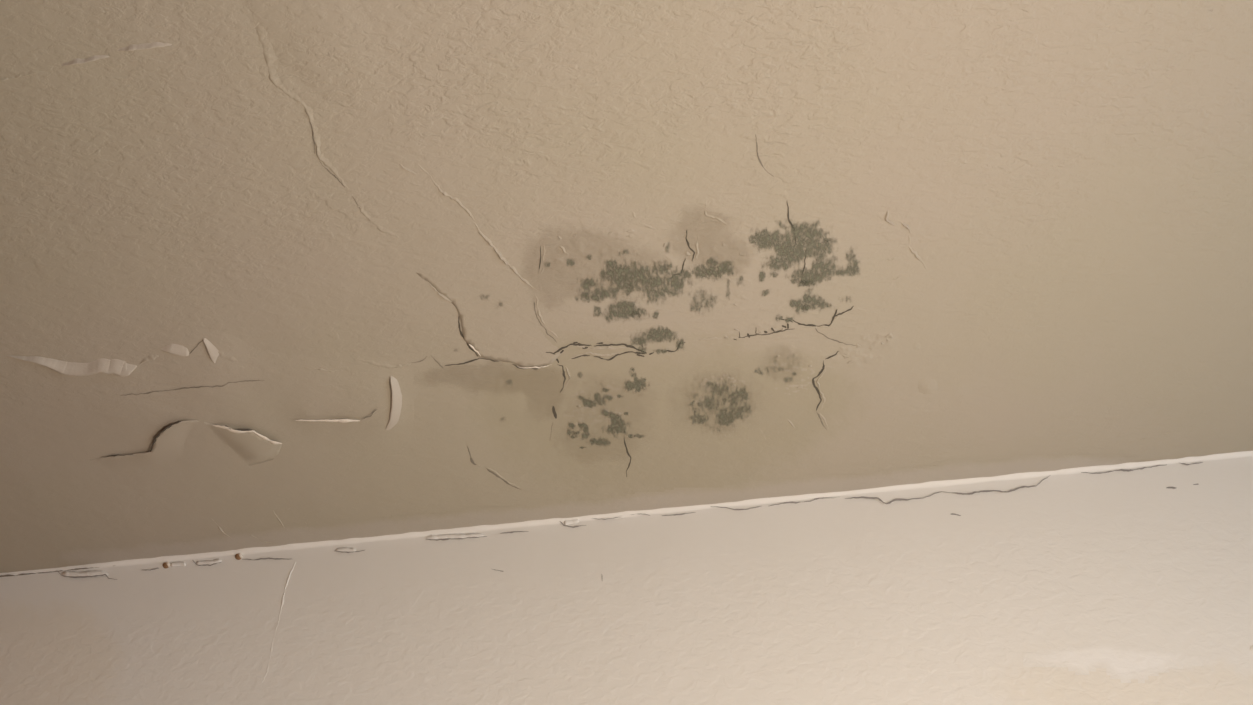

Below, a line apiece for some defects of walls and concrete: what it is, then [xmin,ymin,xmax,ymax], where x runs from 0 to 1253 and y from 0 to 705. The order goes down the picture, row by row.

crack [249,7,399,238]
crack [755,134,807,271]
crack [399,164,905,438]
damp [752,222,858,322]
damp [466,251,876,505]
crack [336,546,364,554]
crack [426,531,529,541]
crack [467,447,520,489]
crack [560,477,1048,528]
crack [1081,462,1203,474]
crack [0,558,296,688]